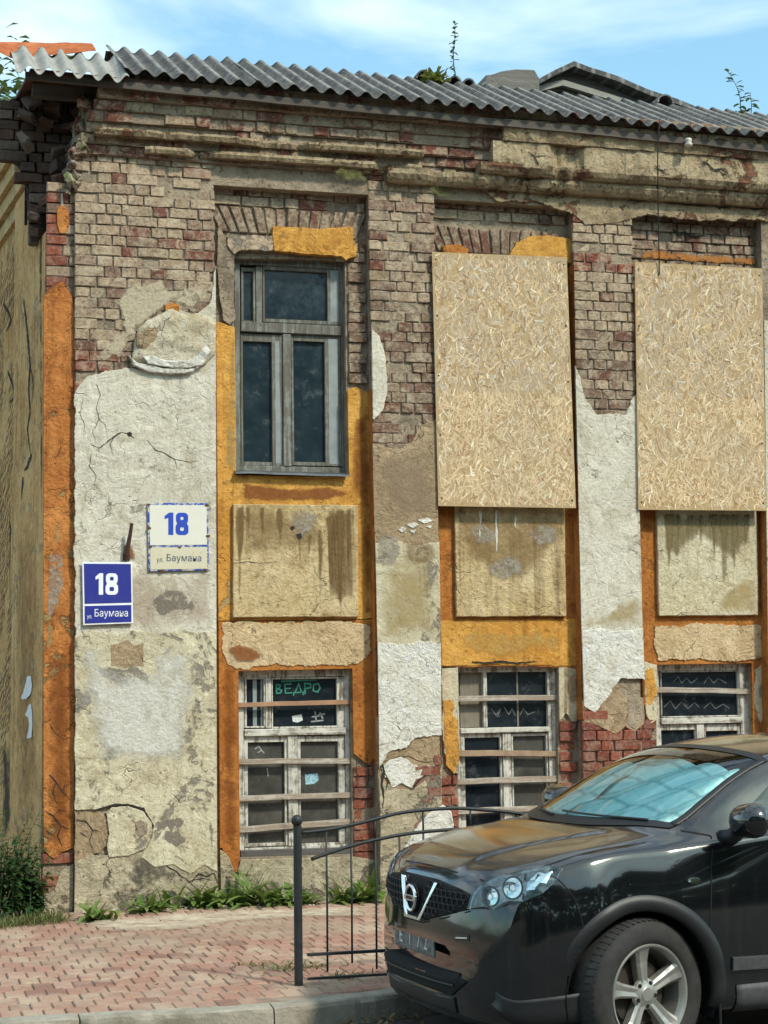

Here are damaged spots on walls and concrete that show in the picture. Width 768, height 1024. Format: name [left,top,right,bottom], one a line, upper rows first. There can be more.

flaking render [46,155,756,453]
crack [80,384,193,486]
leakage [355,419,368,494]
leakage [236,484,345,558]
leakage [294,510,352,599]
leakage [466,510,556,580]
leakage [665,515,749,573]
flaking render [559,674,657,787]
flaking render [353,735,459,860]
crack [166,865,218,888]